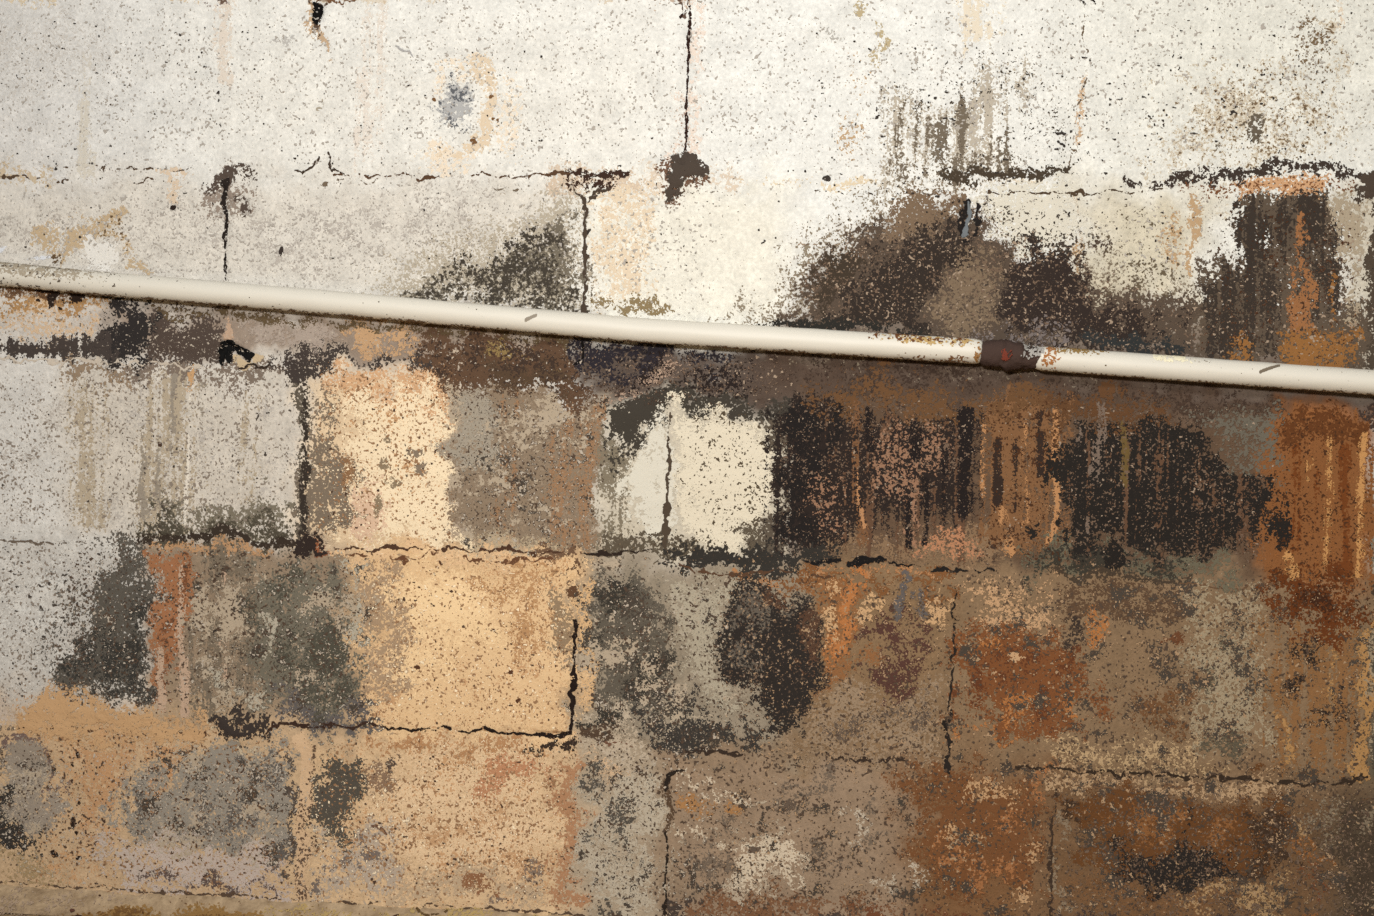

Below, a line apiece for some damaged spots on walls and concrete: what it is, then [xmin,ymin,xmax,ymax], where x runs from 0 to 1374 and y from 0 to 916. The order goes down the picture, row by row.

crack [220,177,230,280]
crack [295,151,614,365]
damp [350,168,675,318]
crack [814,0,1163,243]
corrosion [1156,171,1366,368]
corrosion [11,534,276,852]
damp [0,286,548,914]
corrosion [150,302,691,711]
crack [264,619,633,747]
crack [334,412,997,774]
damp [449,337,1374,916]
corrosion [675,389,1374,916]